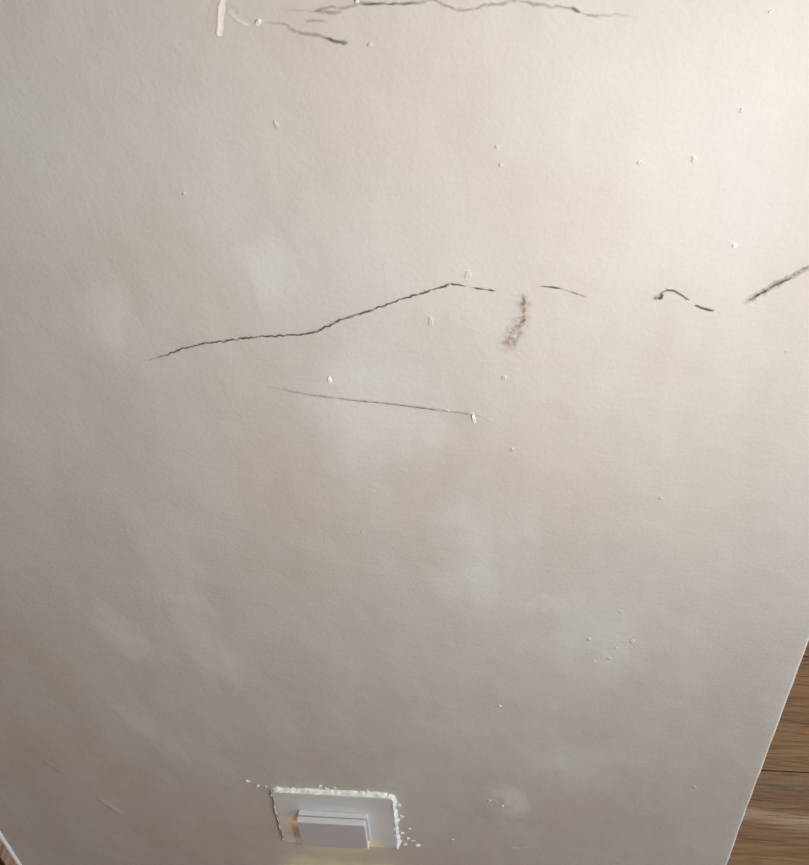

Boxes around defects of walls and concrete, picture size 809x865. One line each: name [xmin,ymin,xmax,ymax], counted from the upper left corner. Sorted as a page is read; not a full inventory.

crack [165,284,493,356]
crack [655,290,713,311]
peeling [246,780,421,850]